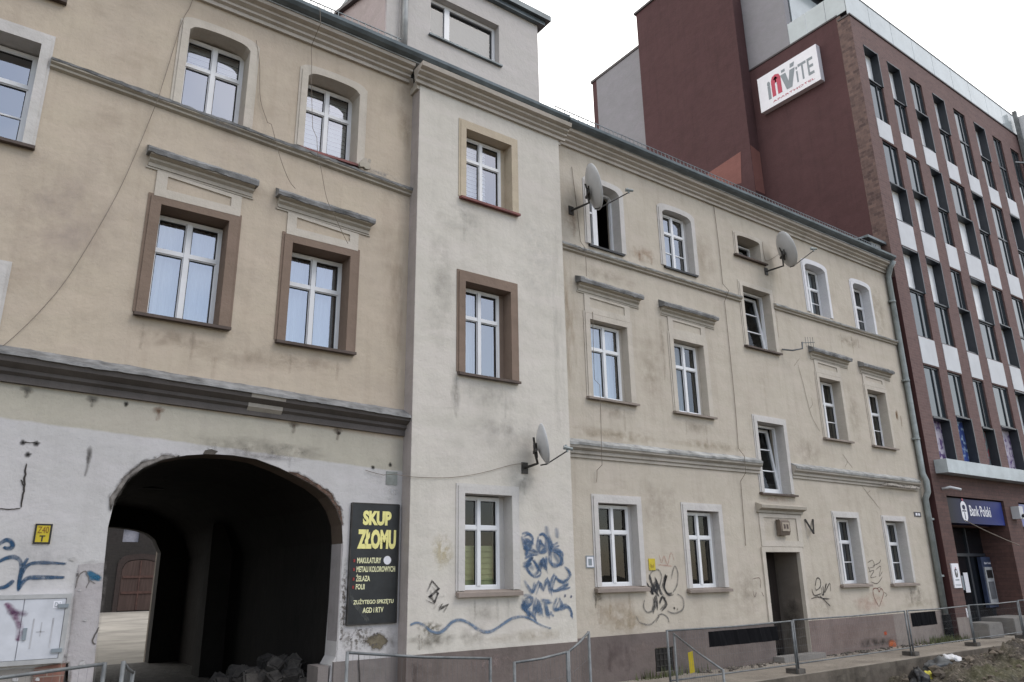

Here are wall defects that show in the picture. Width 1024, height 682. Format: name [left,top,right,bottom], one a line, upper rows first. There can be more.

flaking render [109,455,179,510]
flaking render [289,472,343,525]
flaking render [340,579,388,649]